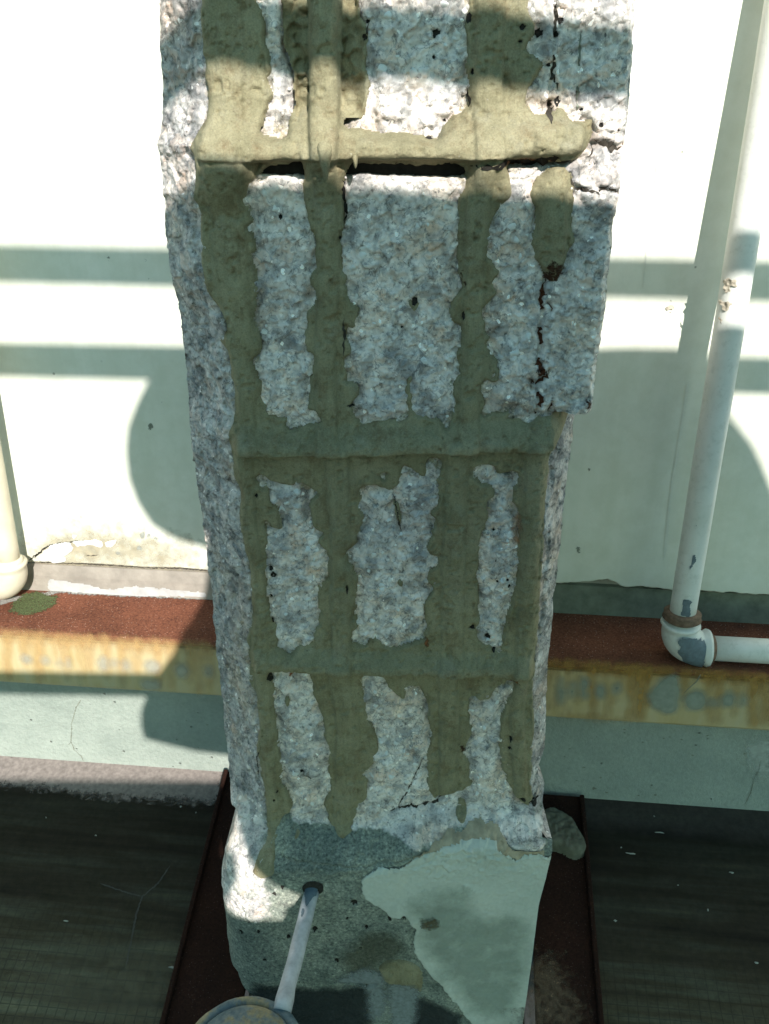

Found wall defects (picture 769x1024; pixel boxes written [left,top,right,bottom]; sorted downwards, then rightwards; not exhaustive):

spalling [343,0,470,139]
spalling [37,0,331,810]
spalling [339,156,571,428]
crack [531,282,553,414]
rust [542,261,563,282]
crack [390,758,440,811]
peeling [346,413,575,1024]